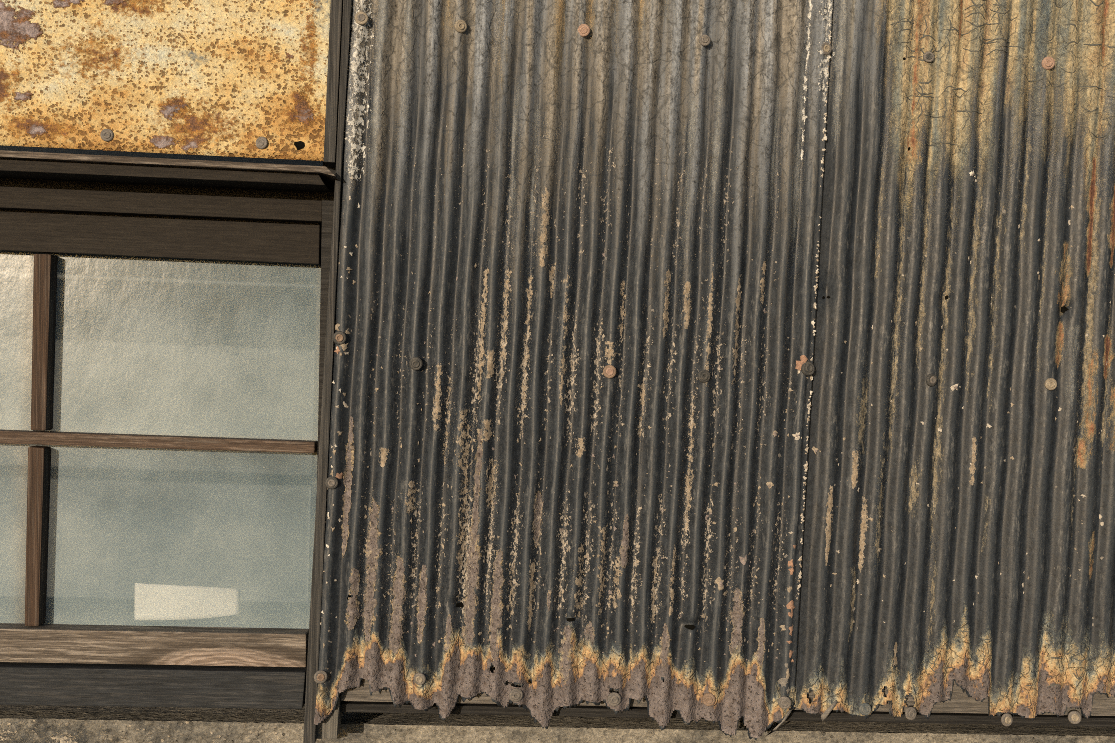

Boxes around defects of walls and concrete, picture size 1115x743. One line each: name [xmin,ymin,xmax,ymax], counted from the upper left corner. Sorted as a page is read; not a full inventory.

rust [0,63,84,143]
rust [50,21,142,87]
rust [149,97,249,150]
rust [887,0,1115,277]
peeling [320,129,821,693]
peeling [836,165,931,642]
peeling [908,138,1050,532]
peeling [1068,198,1113,481]
rust [1076,335,1115,469]
peeling [823,484,840,587]
peeling [924,562,938,645]
rust [314,607,1115,738]